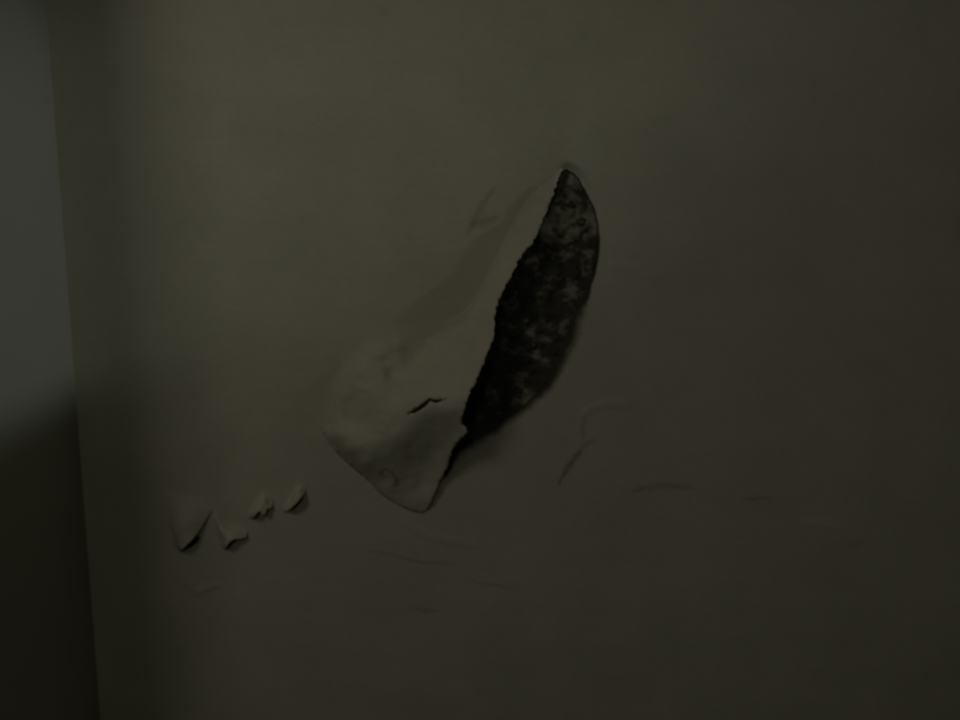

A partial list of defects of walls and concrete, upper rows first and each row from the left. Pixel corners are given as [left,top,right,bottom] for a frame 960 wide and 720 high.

peeling [318,168,601,514]